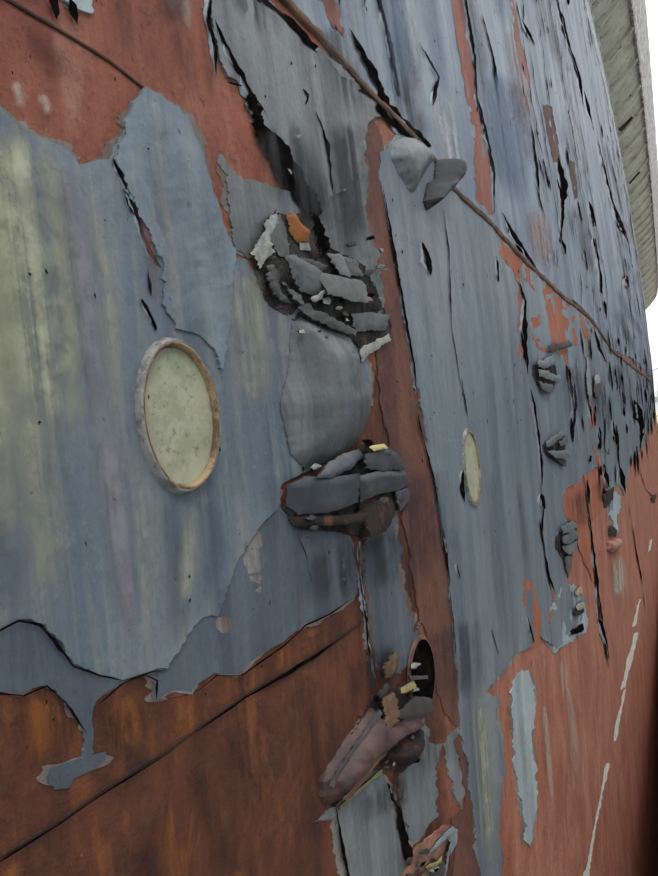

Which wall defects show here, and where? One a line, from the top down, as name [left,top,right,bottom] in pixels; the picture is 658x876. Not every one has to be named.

peeling [60,0,94,15]
crack [335,0,431,147]
crack [417,43,440,106]
crack [463,0,656,666]
peeling [0,86,359,790]
peeling [207,0,654,876]
crack [0,541,377,732]
crack [0,750,174,862]